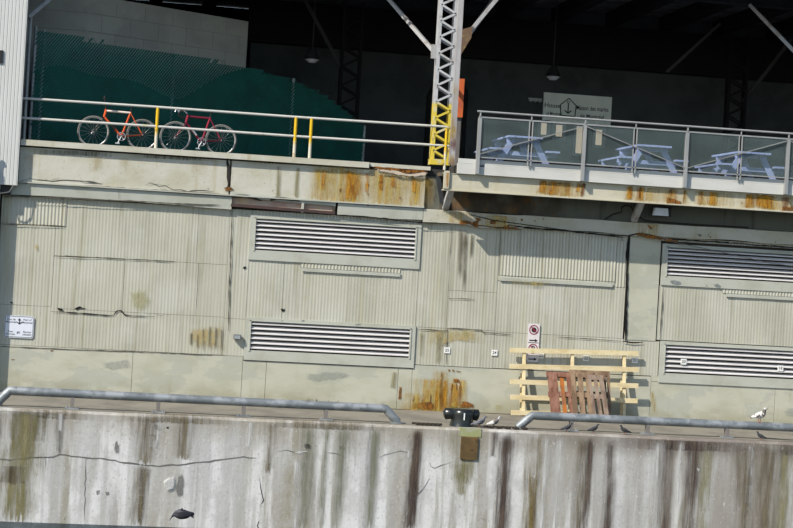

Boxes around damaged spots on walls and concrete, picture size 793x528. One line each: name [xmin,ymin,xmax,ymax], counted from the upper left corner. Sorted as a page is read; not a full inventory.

corrosion [316,166,425,206]
corrosion [455,212,523,230]
corrosion [539,181,585,196]
corrosion [745,194,793,211]
corrosion [411,331,473,411]
water stain [2,409,66,521]
crack [1,445,250,520]
water stain [134,414,203,525]
water stain [294,420,355,528]
water stain [364,434,378,525]
water stain [576,442,592,528]
water stain [603,446,613,528]